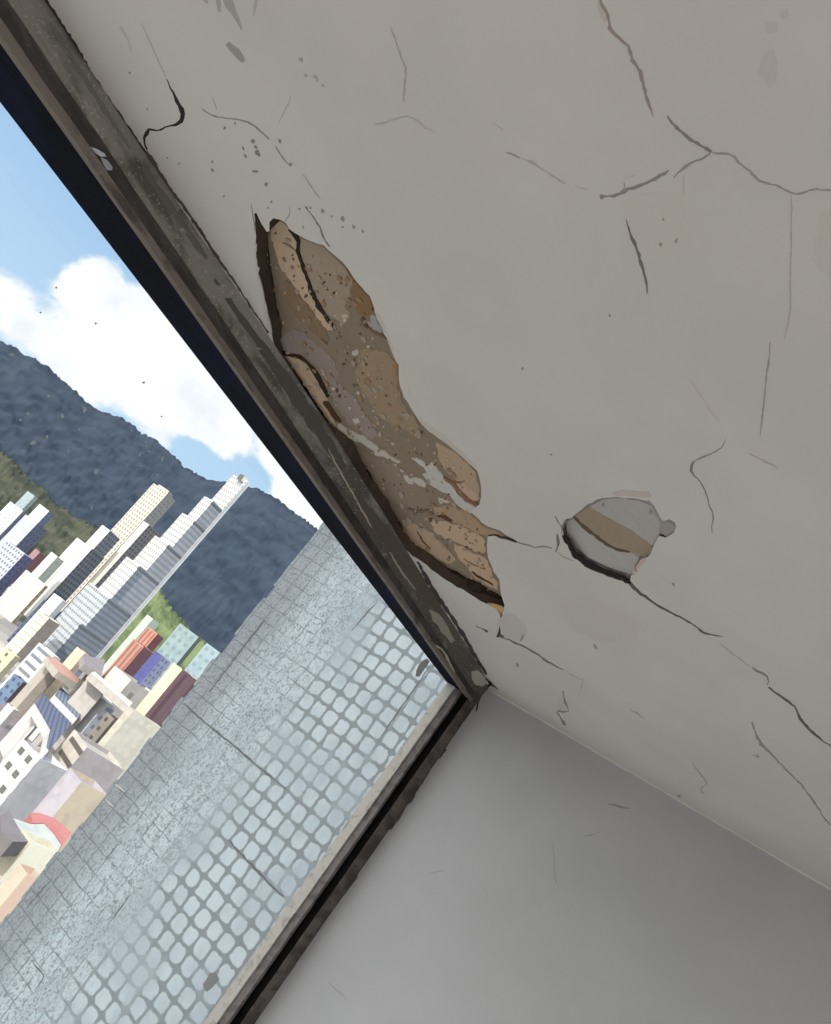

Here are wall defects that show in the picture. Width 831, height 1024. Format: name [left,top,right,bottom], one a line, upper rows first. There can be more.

crack [141,23,335,331]
crack [493,0,831,468]
spalling [225,220,508,643]
crack [475,626,584,726]
spalling [566,490,675,578]
crack [517,498,831,746]
crack [689,379,726,531]
crack [751,722,831,827]